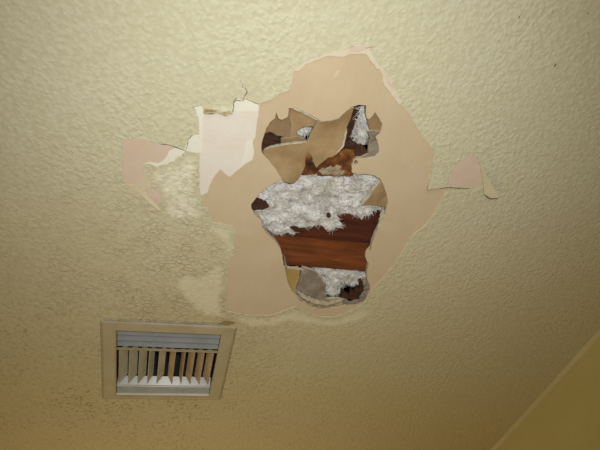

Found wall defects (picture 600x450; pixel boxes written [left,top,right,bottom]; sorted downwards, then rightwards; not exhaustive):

peeling [121,45,448,329]